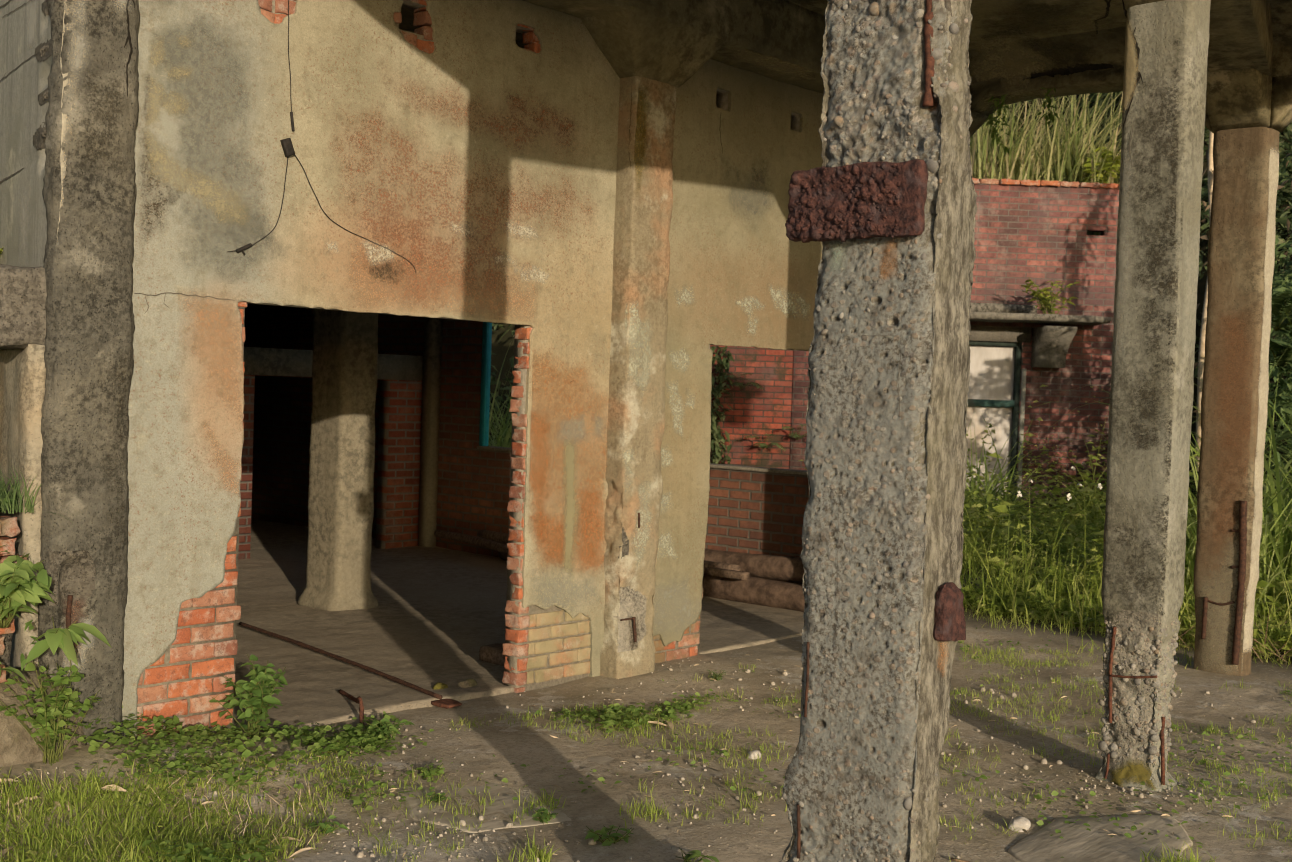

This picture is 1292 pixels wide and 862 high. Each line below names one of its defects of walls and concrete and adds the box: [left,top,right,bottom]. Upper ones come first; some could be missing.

flaking render [258,0,296,24]
flaking render [393,0,434,54]
crack [1021,0,1143,126]
rust [786,163,900,277]
flaking render [137,536,241,735]
flaking render [526,610,591,684]
spalling [613,586,700,663]